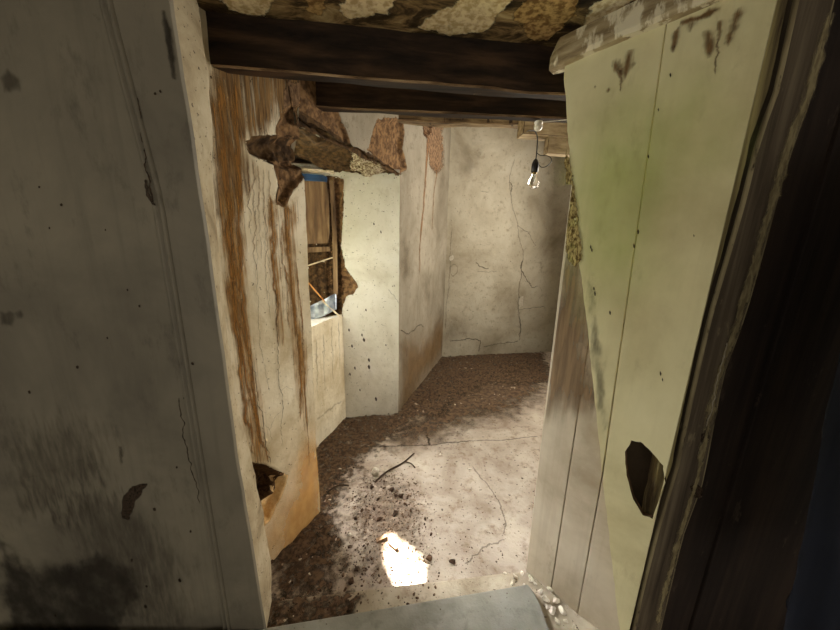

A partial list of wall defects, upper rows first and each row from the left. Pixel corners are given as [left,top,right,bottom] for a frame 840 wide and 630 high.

peeling [339,0,396,19]
peeling [418,0,512,36]
damp [614,53,630,91]
damp [671,9,717,51]
damp [705,10,741,72]
flaking render [245,79,407,319]
corrosion [419,131,437,255]
corrosion [213,83,269,462]
corrosion [268,198,309,450]
crack [452,261,544,348]
crack [178,400,200,502]
flaking render [252,462,288,526]